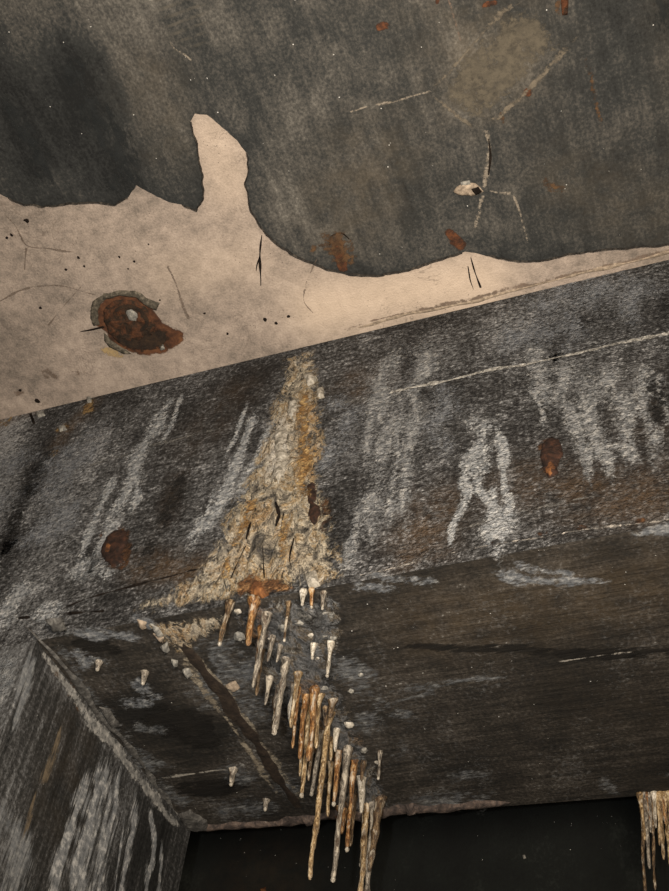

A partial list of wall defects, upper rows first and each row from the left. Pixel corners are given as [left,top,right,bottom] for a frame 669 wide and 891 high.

crack [350,91,428,112]
crack [474,132,528,241]
rust [311,232,354,272]
peeling [0,114,669,420]
crack [390,331,669,394]
damp [497,270,669,482]
efflorescence [187,406,276,550]
damp [315,343,520,572]
rust [538,437,563,479]
rust [99,525,132,570]
damp [0,580,37,631]
damp [0,596,511,891]